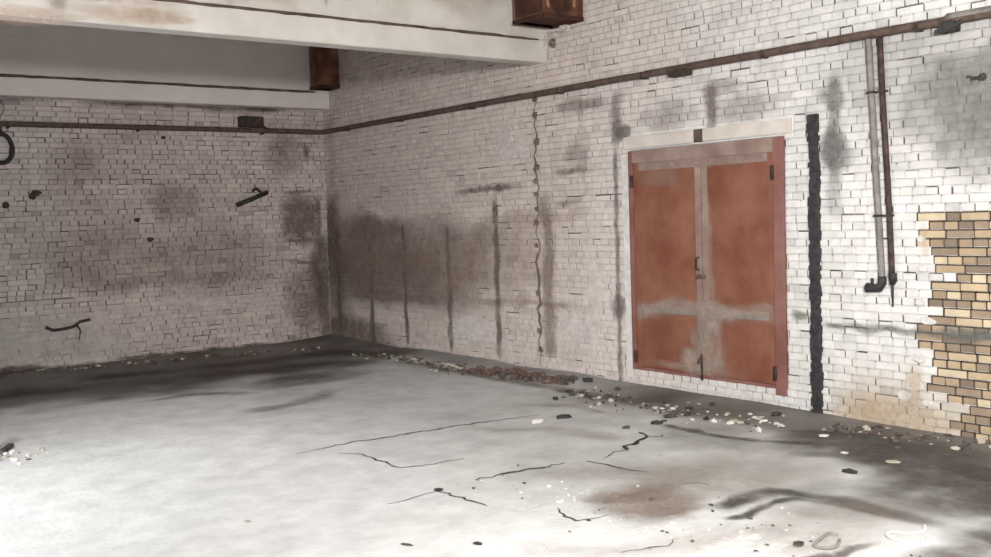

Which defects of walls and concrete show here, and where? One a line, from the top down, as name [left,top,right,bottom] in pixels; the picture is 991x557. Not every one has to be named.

damp [823,80,845,176]
damp [446,229,488,349]
crack [533,102,542,359]
damp [542,214,560,353]
damp [614,155,622,381]
flaking render [896,211,991,441]
crack [298,415,536,468]
crack [388,432,663,506]